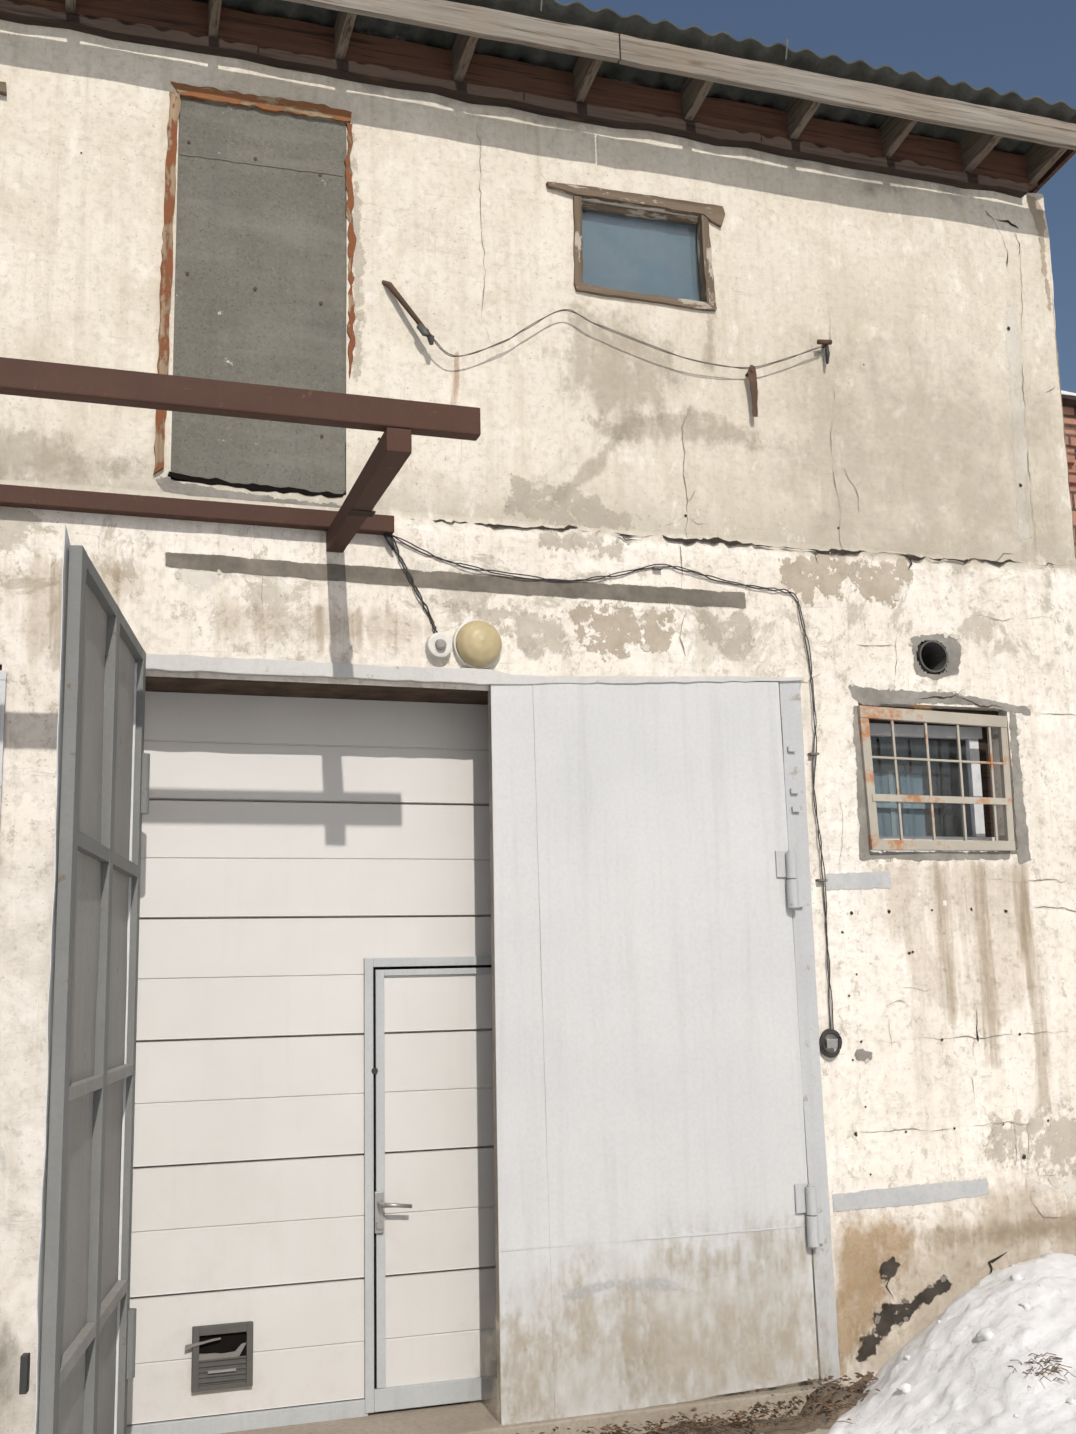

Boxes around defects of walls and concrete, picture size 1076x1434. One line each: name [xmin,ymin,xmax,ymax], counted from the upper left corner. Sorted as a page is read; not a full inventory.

crack [413,211,1063,656]
peeling [560,599,679,662]
peeling [778,552,914,609]
damp [836,1224,909,1369]
spalling [856,1256,952,1362]